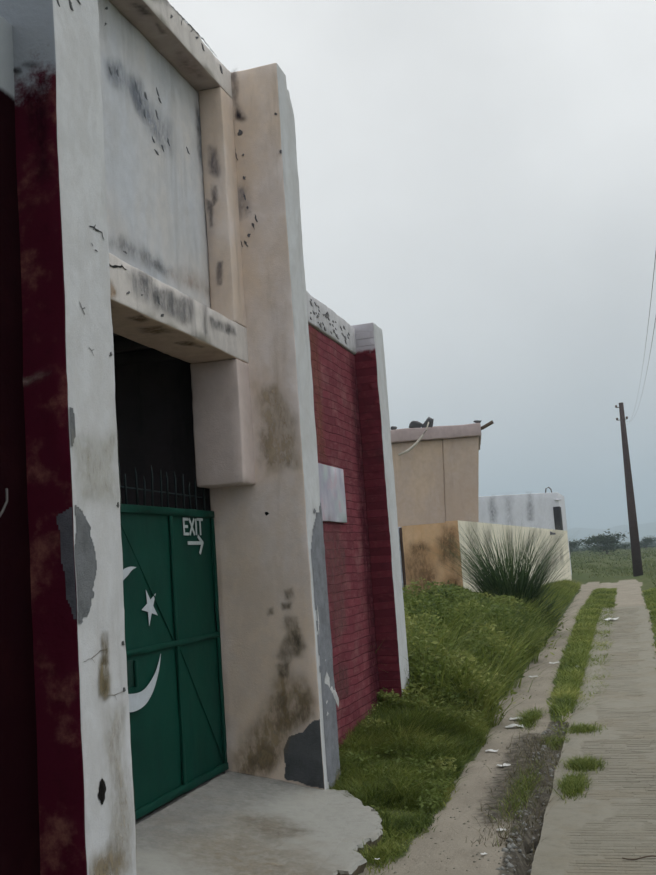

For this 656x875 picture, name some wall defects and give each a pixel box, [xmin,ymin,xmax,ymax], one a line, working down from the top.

peeling [310,299,350,344]
spalling [56,505,97,624]
spalling [284,503,341,789]
leakage [240,676,309,775]